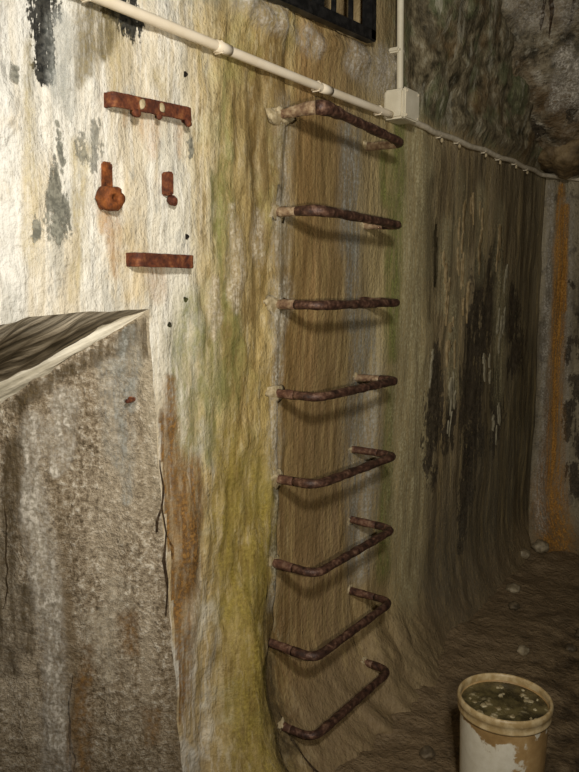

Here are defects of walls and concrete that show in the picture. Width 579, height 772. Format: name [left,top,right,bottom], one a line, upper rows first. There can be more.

leakage [26,0,63,87]
leakage [78,2,145,83]
leakage [209,277,222,340]
leakage [228,205,243,314]
corrosion [537,183,570,552]
leakage [557,330,579,499]
crack [156,460,174,616]
corrosion [159,376,202,722]